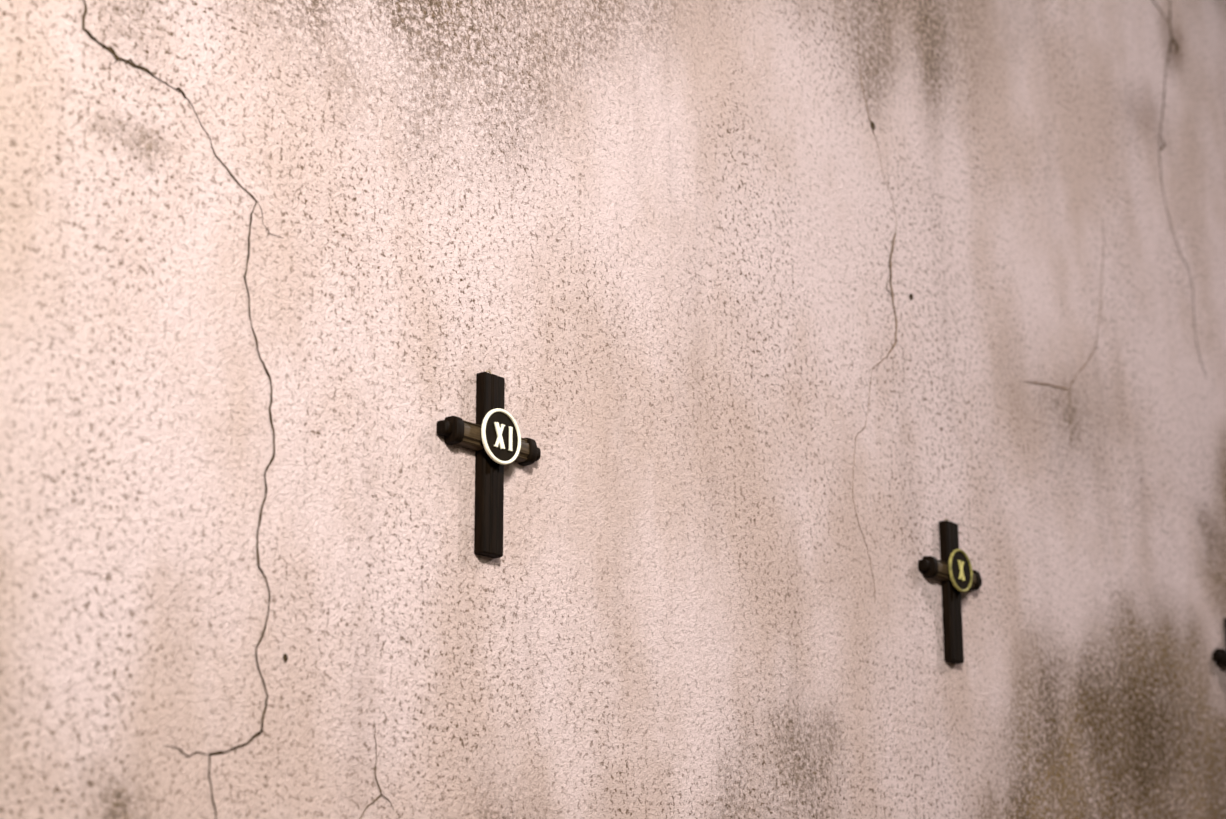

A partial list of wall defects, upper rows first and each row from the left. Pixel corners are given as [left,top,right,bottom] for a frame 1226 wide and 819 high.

crack [82,0,283,819]
crack [852,24,897,589]
crack [1152,0,1207,379]
crack [360,731,394,819]
leakage [989,603,1226,819]